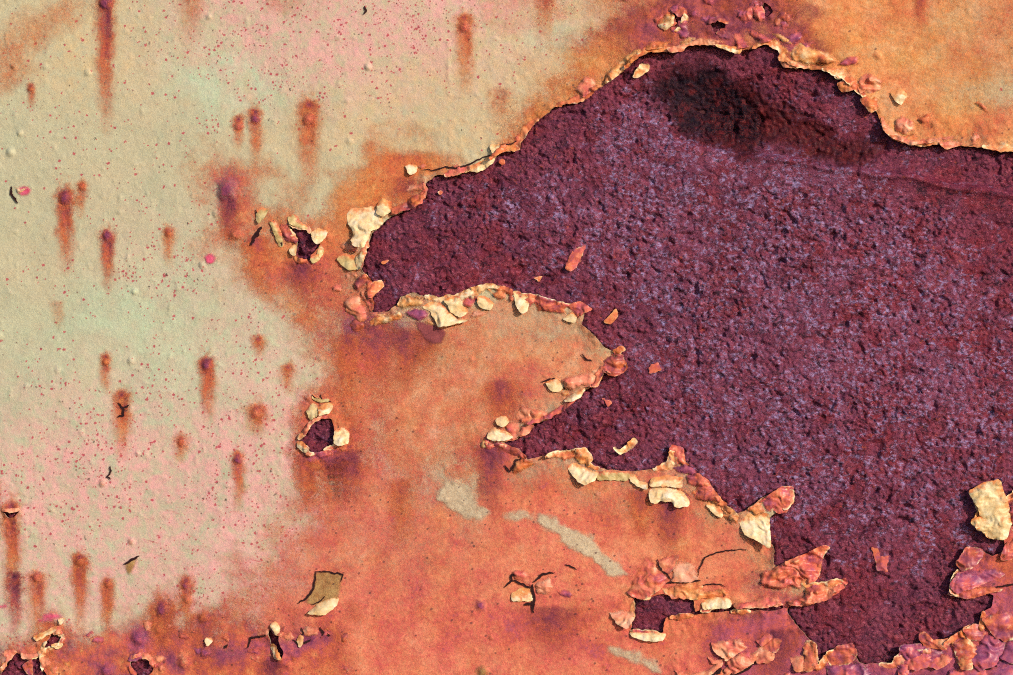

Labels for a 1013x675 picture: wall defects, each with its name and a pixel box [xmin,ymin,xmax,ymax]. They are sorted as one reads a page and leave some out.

rust [97,0,115,98]
rust [503,0,1013,148]
rust [298,99,318,166]
rust [707,81,879,165]
peeling [256,207,328,264]
peeling [333,29,1013,675]
peeling [297,395,352,464]
rust [0,142,830,675]
peeling [0,618,70,675]
peeling [242,621,329,663]
peeling [308,597,339,615]
rust [911,528,1013,675]